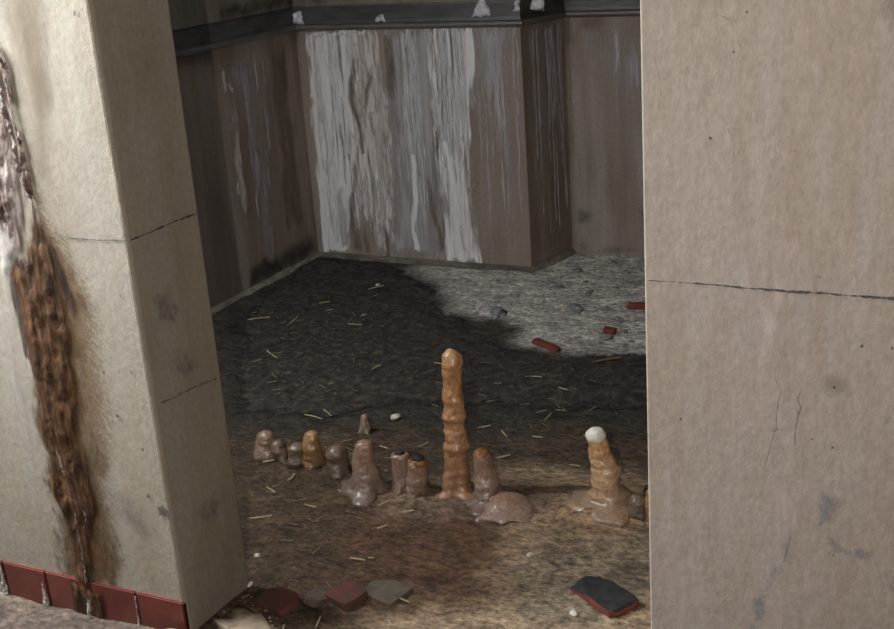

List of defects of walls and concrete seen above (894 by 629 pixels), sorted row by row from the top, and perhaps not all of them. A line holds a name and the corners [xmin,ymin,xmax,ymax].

water stain [615,32,639,101]
water stain [222,51,312,285]
water stain [305,21,574,263]
crack [46,214,195,241]
crack [648,280,894,300]
corrosion [10,187,125,619]
crack [766,379,801,461]